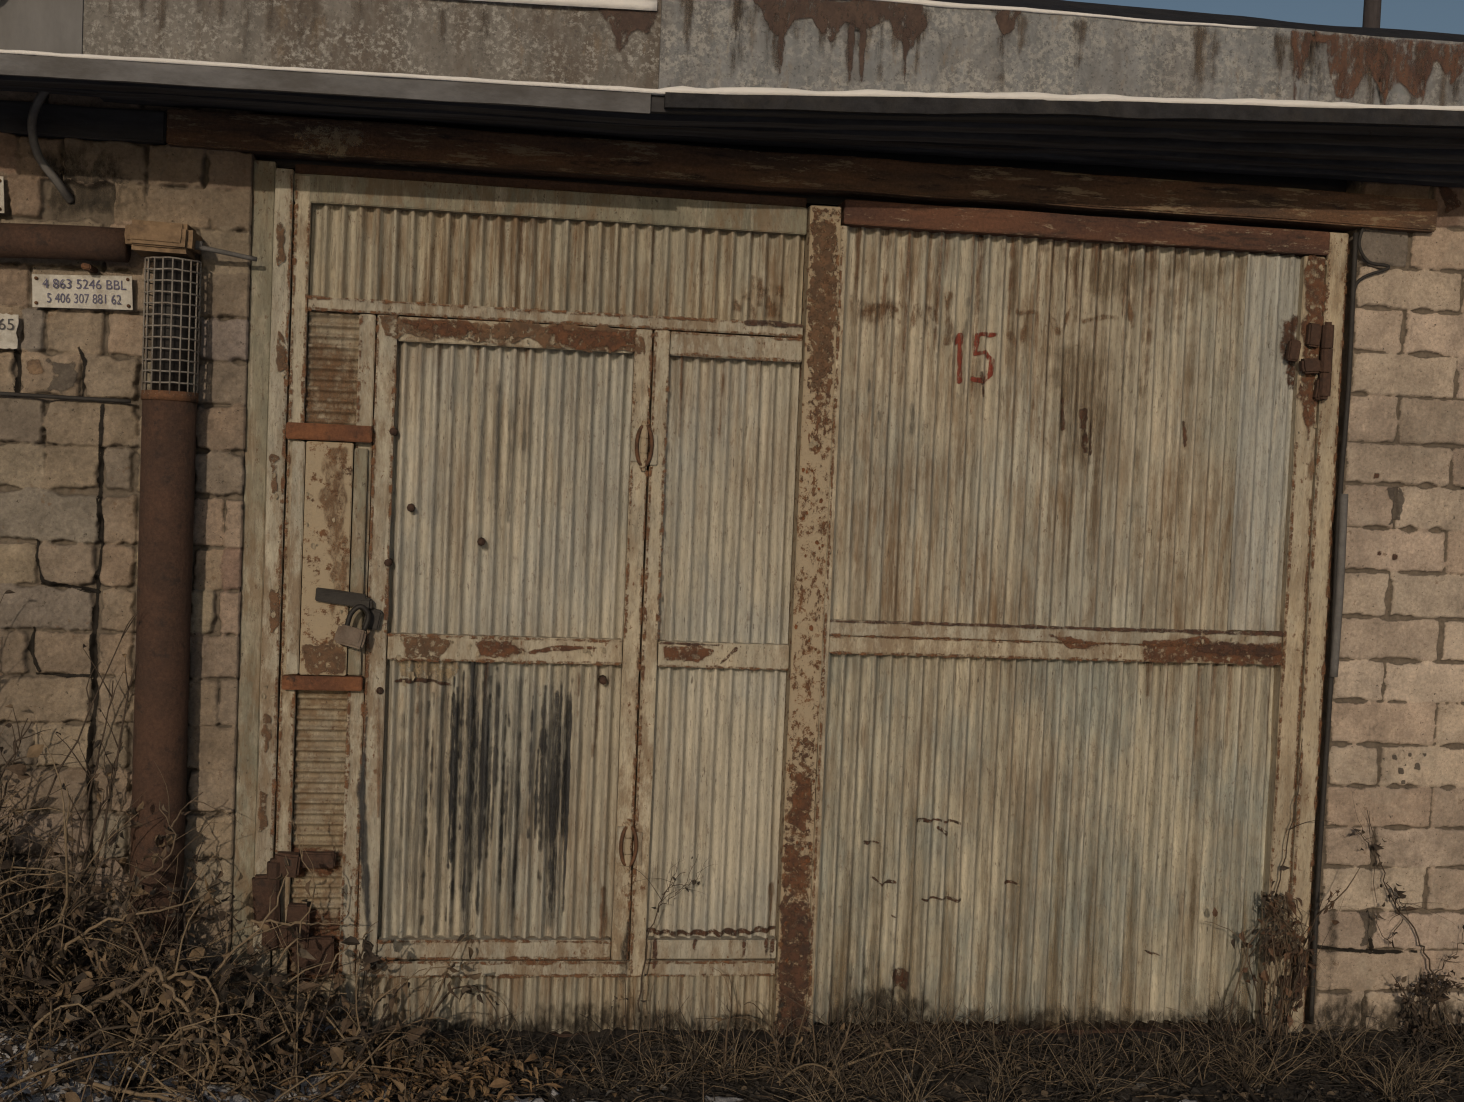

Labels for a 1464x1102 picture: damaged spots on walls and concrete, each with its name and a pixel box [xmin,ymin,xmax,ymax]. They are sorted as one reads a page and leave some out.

rust [754,0,927,82]
rust [1291,30,1464,105]
peeling [302,639,346,676]
peeling [305,447,348,613]
rust [270,179,1349,1038]
damp [399,661,572,931]